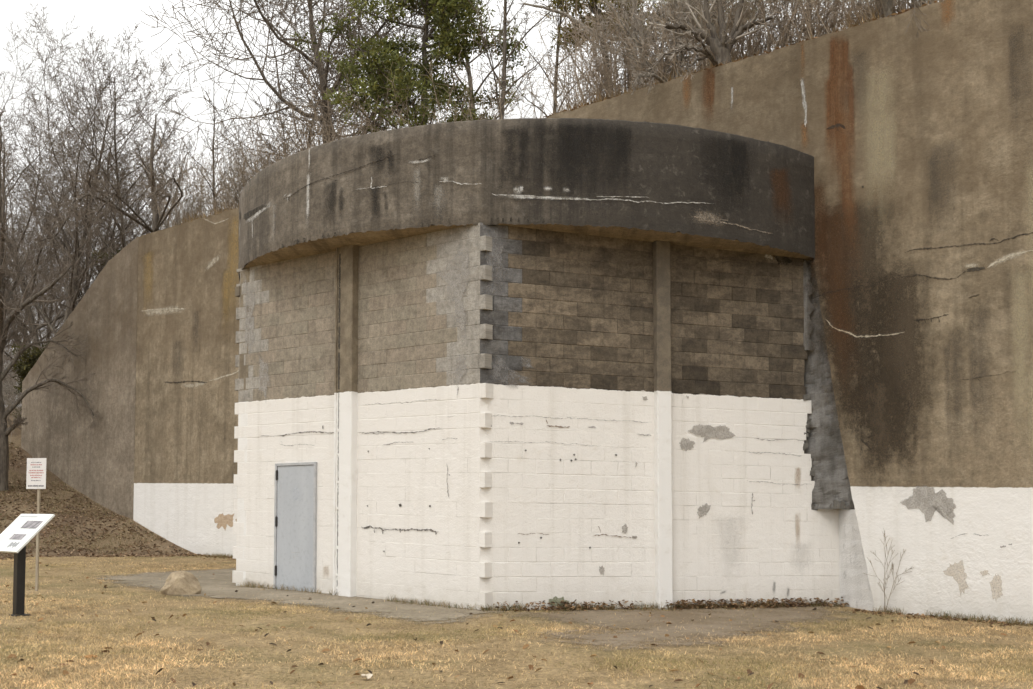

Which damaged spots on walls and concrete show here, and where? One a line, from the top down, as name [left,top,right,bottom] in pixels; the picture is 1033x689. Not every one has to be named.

water stain [493,126,627,199]
crack [904,232,1033,298]
water stain [807,204,925,464]
crack [165,380,208,388]
crack [263,426,334,446]
peeling [680,424,735,451]
peeling [214,513,237,530]
crack [361,526,437,534]
peeling [697,503,711,518]
peeling [901,486,956,524]
peeling [944,561,968,596]
peeling [980,570,1003,600]